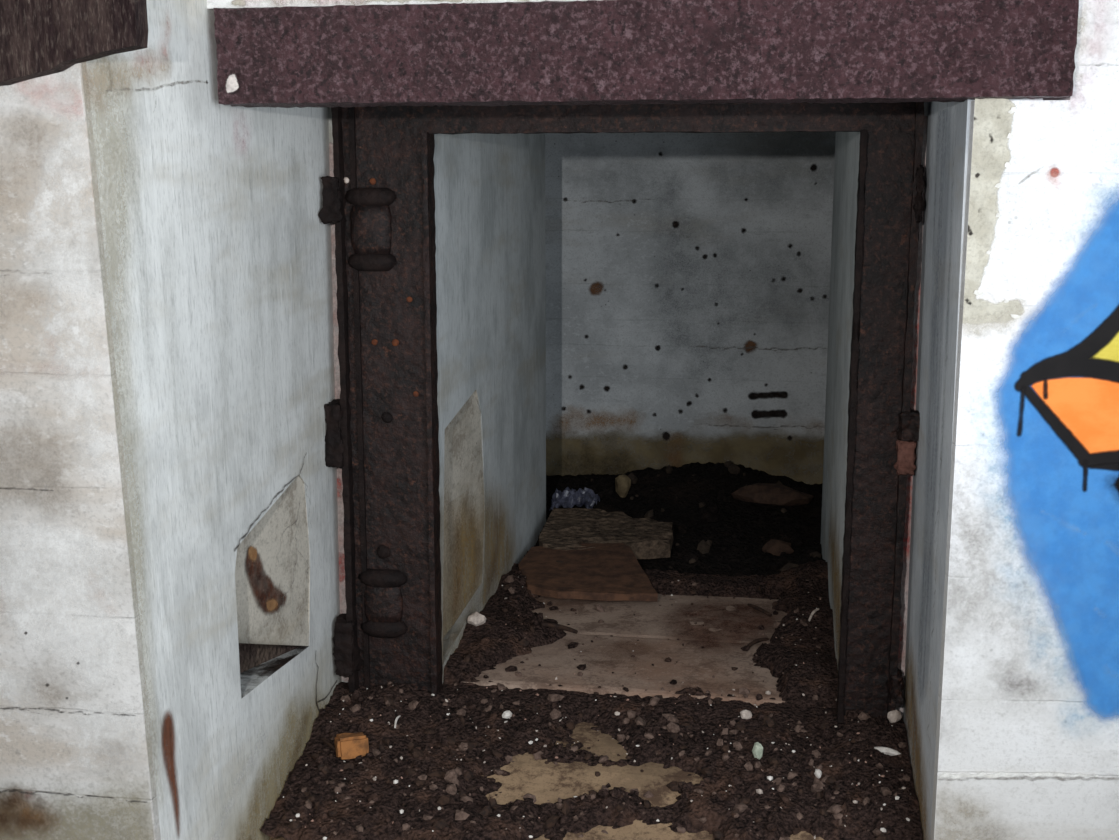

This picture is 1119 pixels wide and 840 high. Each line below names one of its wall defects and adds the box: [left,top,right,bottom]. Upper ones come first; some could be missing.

peeling [963,98,1024,334]
corrosion [246,547,286,613]
leakage [0,794,154,840]
corrosion [162,714,179,832]